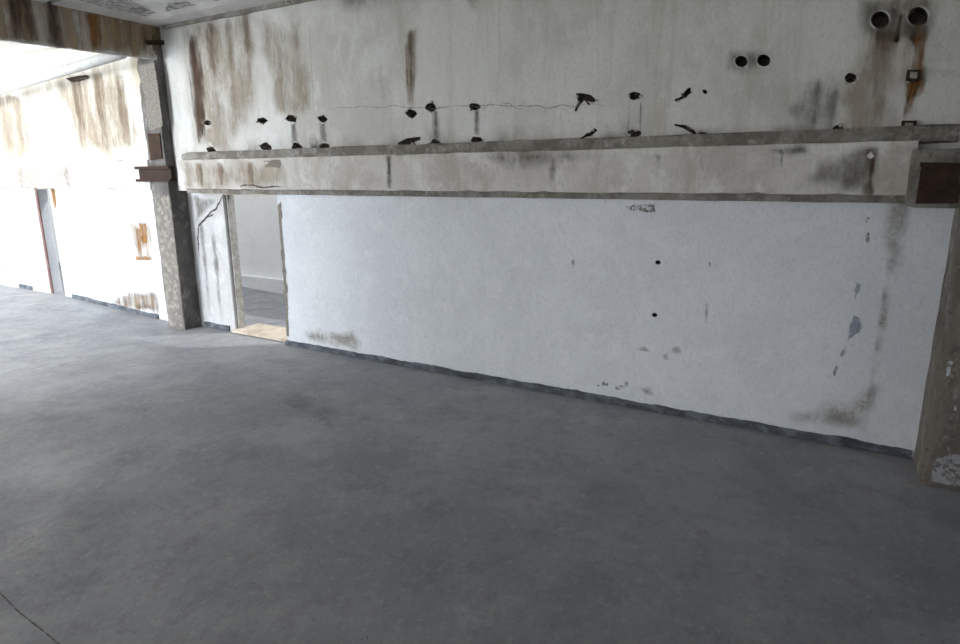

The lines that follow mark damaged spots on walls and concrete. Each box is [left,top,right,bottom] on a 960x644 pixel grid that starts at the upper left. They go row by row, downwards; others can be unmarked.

water stain [0,0,194,56]
water stain [191,26,250,146]
water stain [266,29,307,111]
water stain [186,164,279,186]
spalling [931,454,960,486]